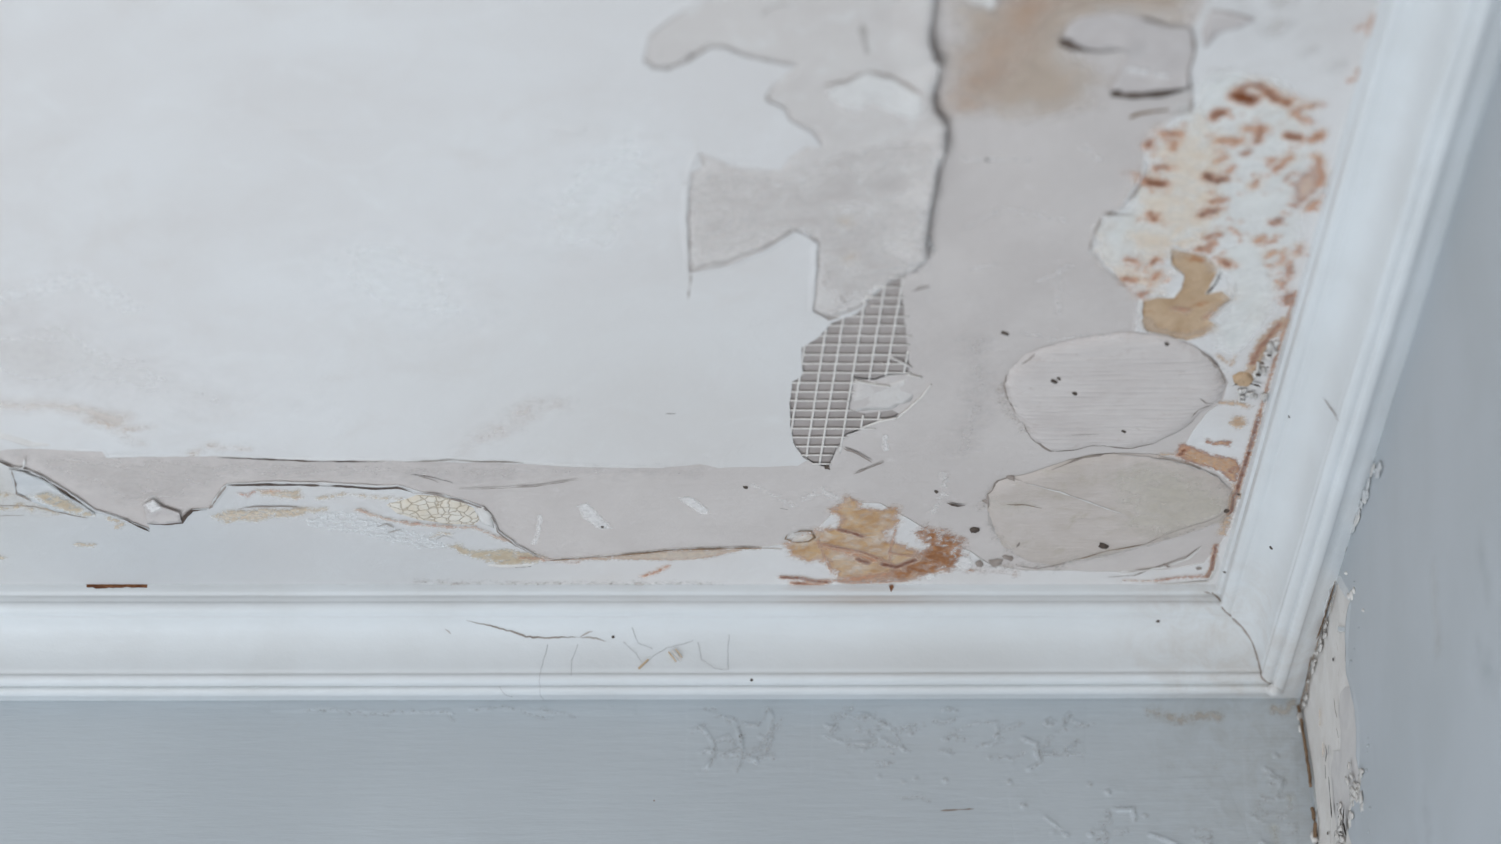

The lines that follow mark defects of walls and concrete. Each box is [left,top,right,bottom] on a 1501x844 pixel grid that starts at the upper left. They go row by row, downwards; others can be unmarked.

peeling [0,0,1255,571]
peeling [1299,576,1364,844]